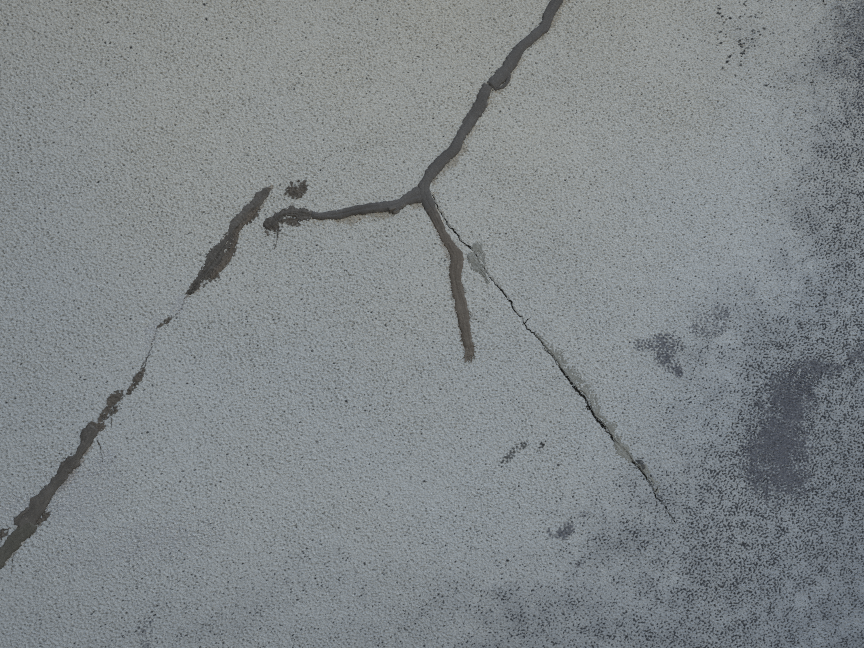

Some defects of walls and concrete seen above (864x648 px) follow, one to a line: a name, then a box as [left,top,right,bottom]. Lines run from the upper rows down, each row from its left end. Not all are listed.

crack [0,0,675,569]
leakage [633,333,685,377]
leakage [739,358,843,506]